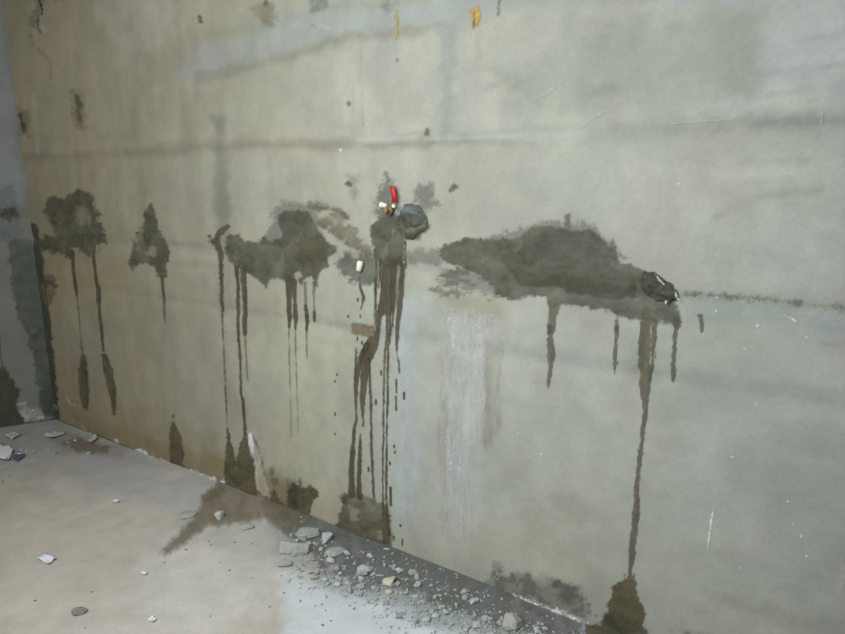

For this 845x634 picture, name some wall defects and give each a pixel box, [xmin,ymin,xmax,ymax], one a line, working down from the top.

damp [0,190,116,428]
damp [129,203,169,319]
damp [164,173,681,634]